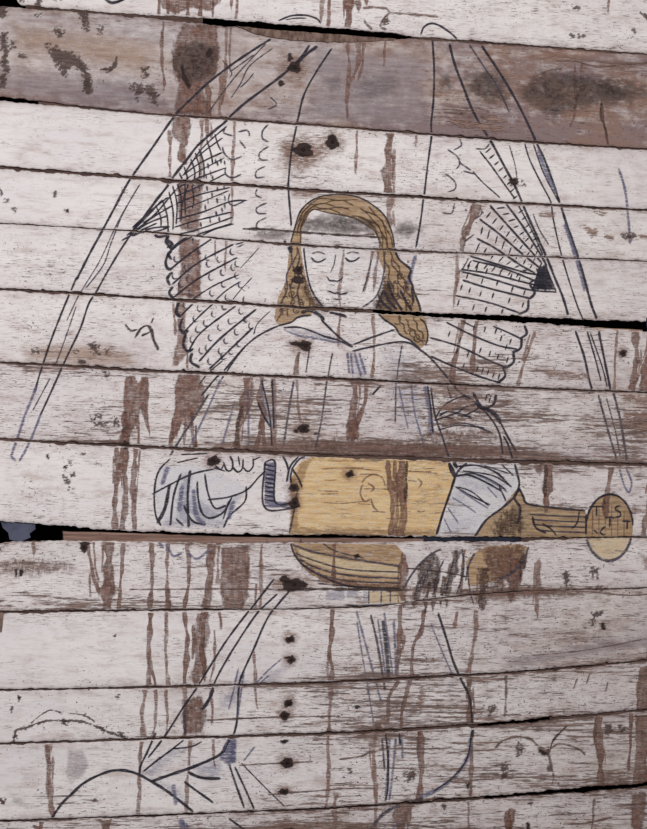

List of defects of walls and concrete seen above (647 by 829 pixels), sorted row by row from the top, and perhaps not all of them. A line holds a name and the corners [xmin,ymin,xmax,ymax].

leakage [320,0,331,26]
leakage [526,64,634,144]
leakage [157,0,239,448]